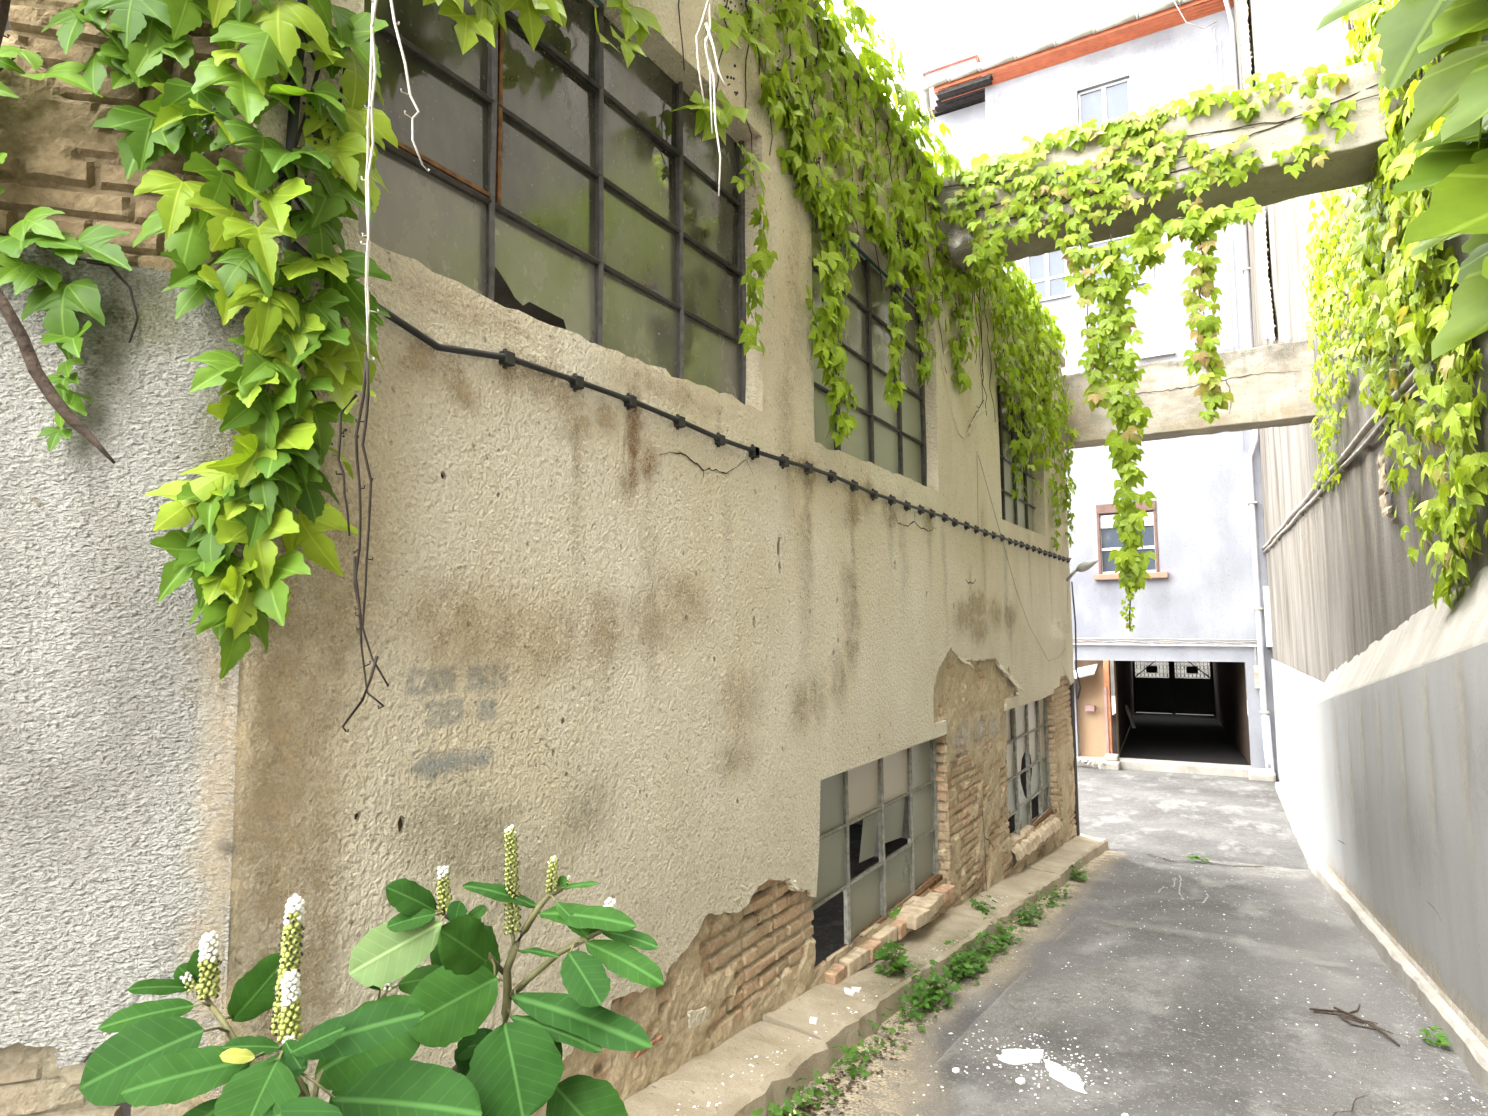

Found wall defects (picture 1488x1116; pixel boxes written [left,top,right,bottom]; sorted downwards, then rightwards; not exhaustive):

spalling [0,0,254,273]
water stain [500,356,611,432]
crack [660,452,753,477]
spalling [560,649,1077,1101]
spalling [0,1042,209,1116]
spalling [531,1102,547,1116]